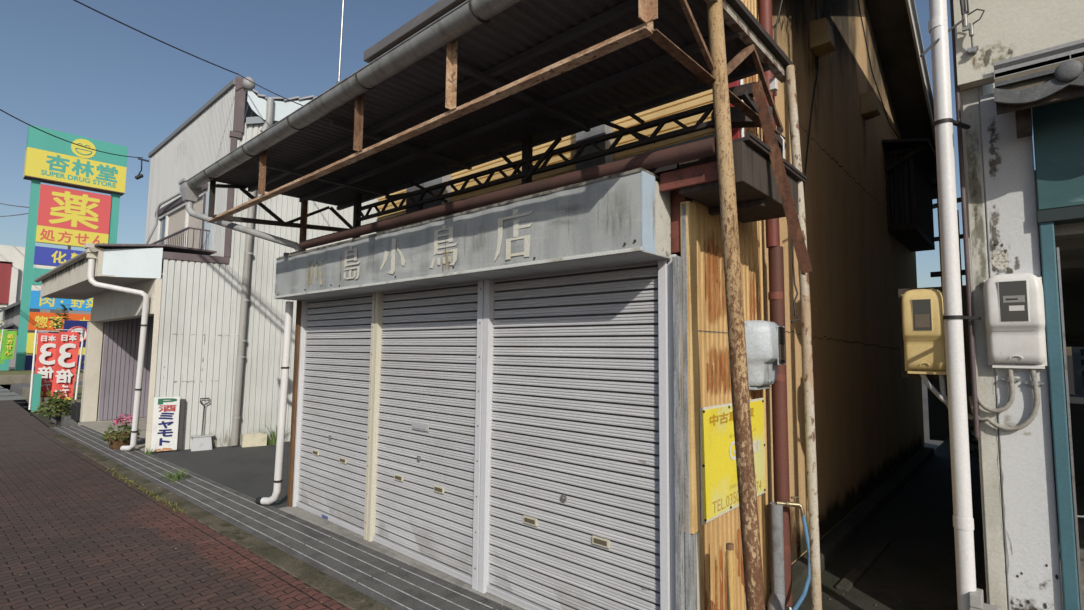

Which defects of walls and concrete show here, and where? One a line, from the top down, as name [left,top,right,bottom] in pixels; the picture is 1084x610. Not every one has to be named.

spalling [989,240,1013,274]
rust [749,274,761,320]
rust [707,347,731,394]
rust [704,526,745,610]